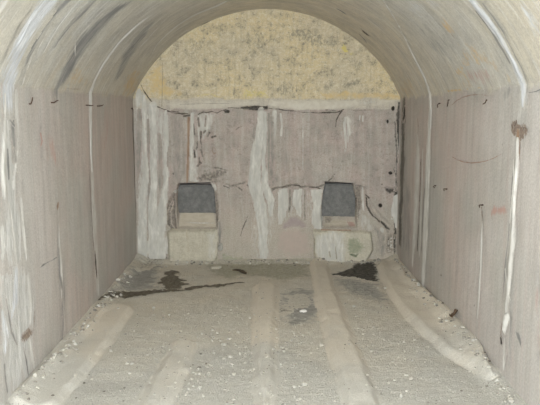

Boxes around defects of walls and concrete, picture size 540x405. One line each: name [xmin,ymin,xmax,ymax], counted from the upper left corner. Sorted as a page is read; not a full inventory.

water stain [53,0,432,305]
crack [365,194,391,231]
water stain [474,137,522,373]
rust [510,118,529,161]